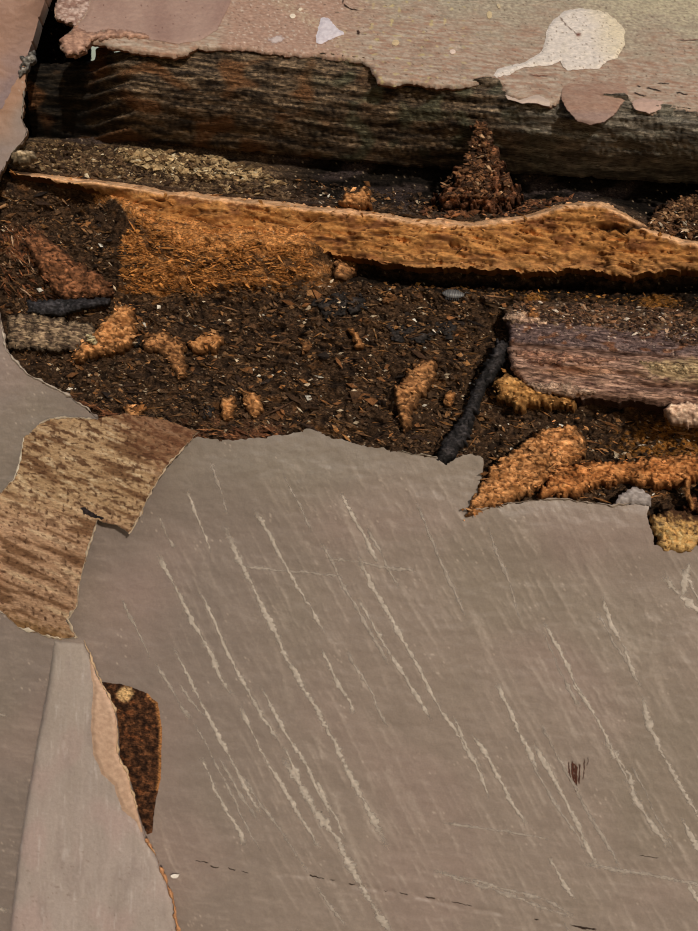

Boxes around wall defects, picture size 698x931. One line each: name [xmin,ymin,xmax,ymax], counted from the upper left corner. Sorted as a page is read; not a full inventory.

spalling [18,0,149,85]
spalling [0,91,698,640]
peeling [10,640,181,931]